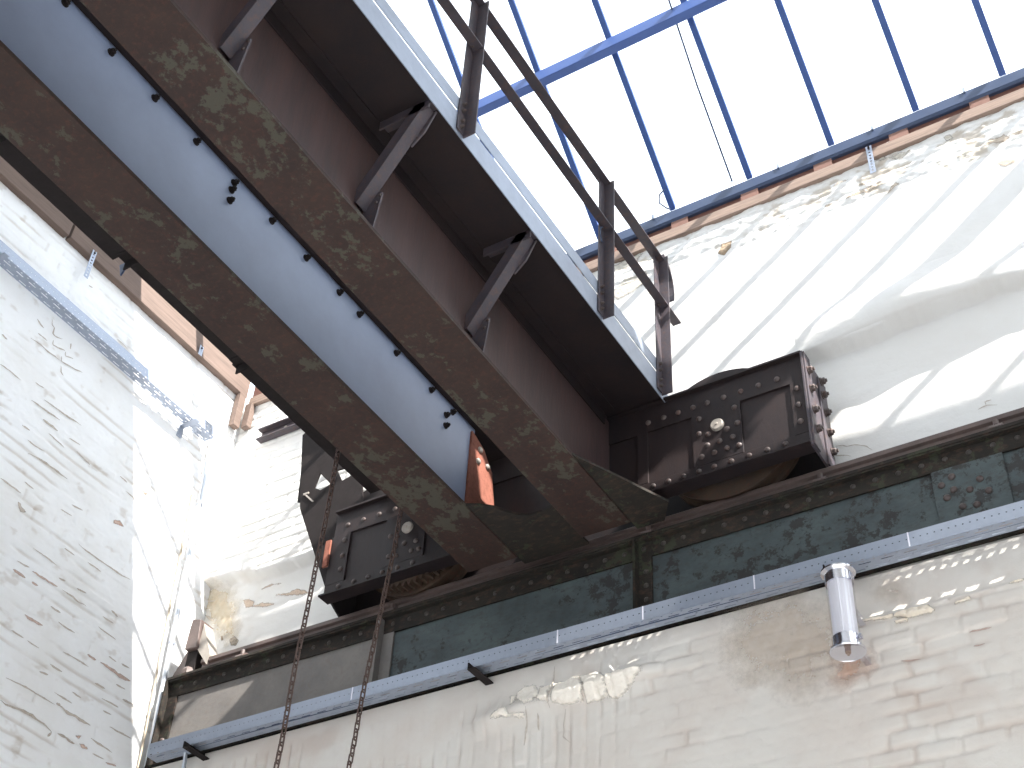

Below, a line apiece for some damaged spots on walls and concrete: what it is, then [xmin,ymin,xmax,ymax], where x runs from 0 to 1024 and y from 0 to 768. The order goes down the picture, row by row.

spalling [943,130,1023,168]
spalling [847,181,898,198]
spalling [718,241,731,255]
spalling [244,584,307,607]
spalling [490,666,641,718]